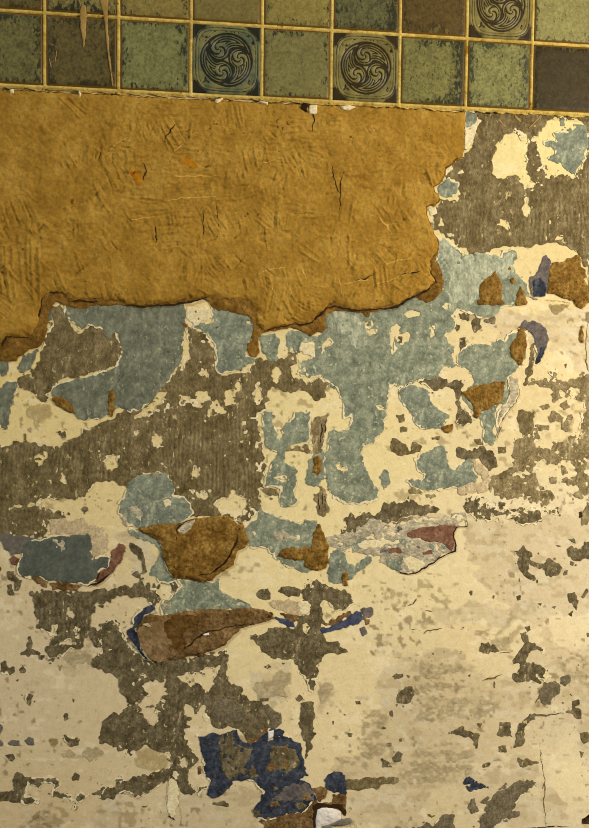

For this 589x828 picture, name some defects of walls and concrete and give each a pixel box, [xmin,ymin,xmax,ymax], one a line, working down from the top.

flaking render [300,103,317,114]
peeling [286,111,589,526]
spalling [0,303,399,821]
peeling [326,496,468,584]
spalling [515,538,589,583]
spalling [567,588,588,616]
spalling [479,642,499,654]
spalling [389,673,415,717]
spalling [497,626,582,767]
spalling [449,723,482,749]
spalling [412,814,455,828]
spalling [463,776,536,828]